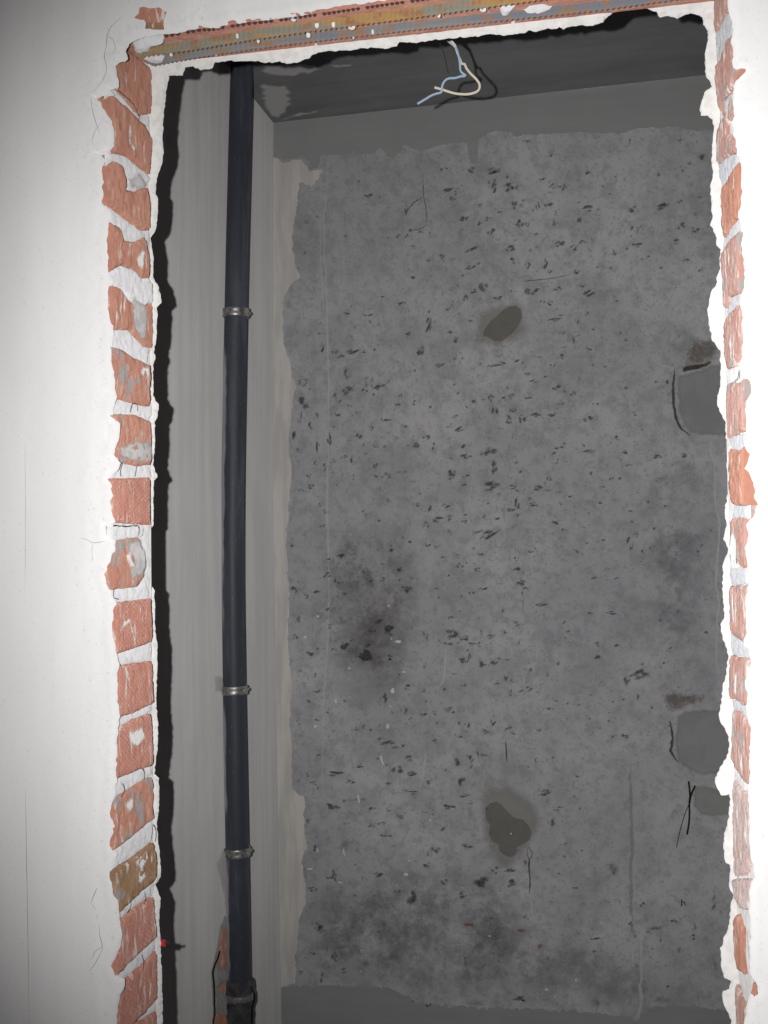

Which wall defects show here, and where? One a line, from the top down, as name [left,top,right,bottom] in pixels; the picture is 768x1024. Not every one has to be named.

crack [672,370,690,436]
spalling [481,462,551,539]
crack [669,721,678,762]